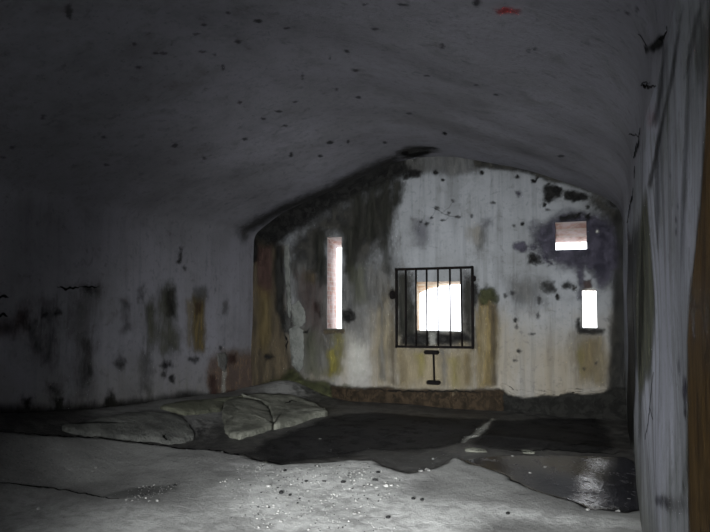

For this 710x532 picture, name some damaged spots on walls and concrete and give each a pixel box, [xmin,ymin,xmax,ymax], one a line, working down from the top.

water stain [146,285,178,353]
water stain [251,160,478,386]
water stain [504,183,654,448]